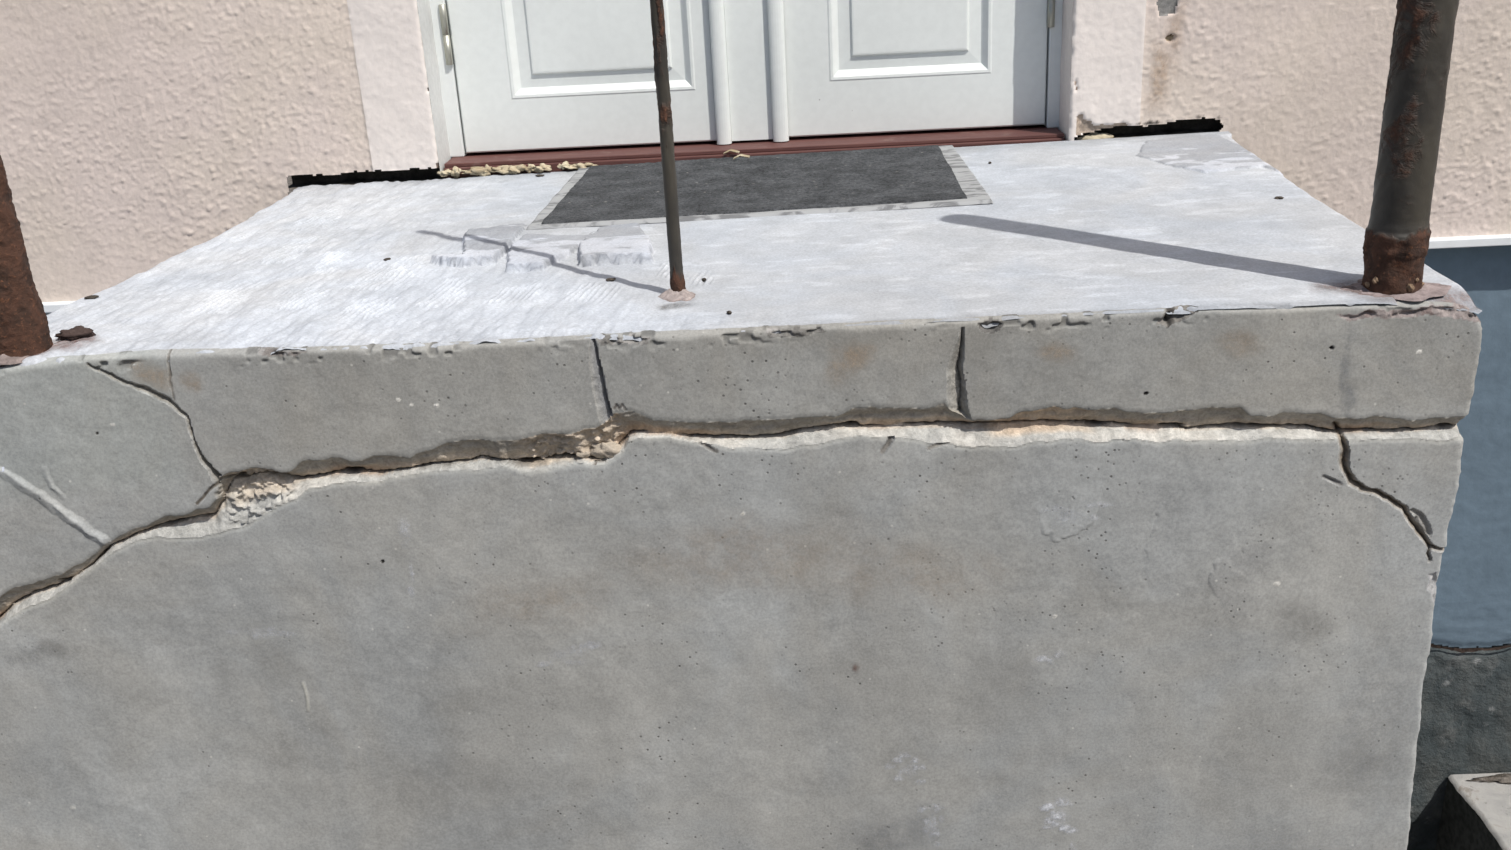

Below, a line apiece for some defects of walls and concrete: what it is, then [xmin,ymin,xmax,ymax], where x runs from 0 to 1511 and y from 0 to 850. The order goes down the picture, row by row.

flaking render [1156,0,1178,16]
crack [0,349,1464,623]